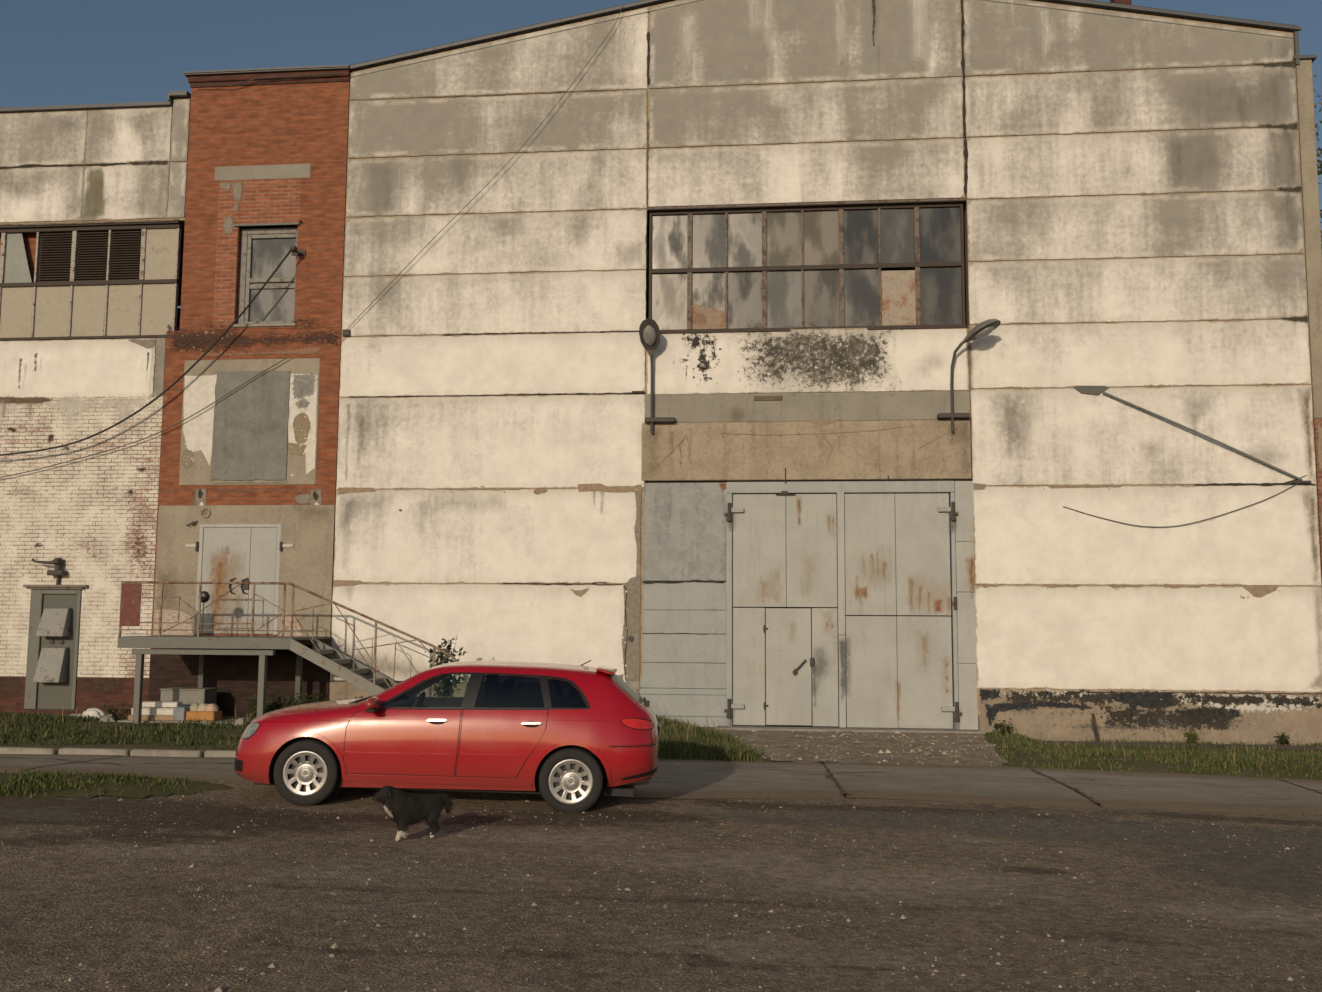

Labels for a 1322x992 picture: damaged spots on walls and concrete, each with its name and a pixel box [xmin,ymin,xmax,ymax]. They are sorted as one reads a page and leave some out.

leakage [673,329,721,382]
flaking render [289,413,310,455]
peeling [1151,690,1321,720]